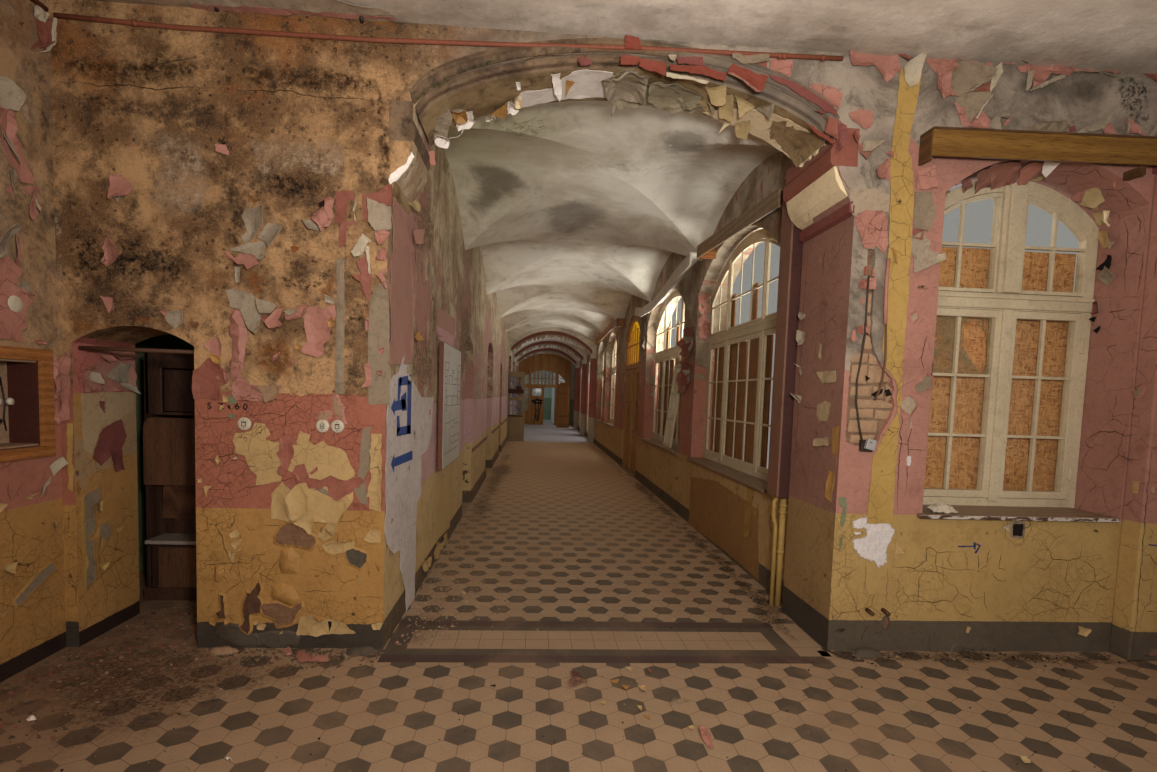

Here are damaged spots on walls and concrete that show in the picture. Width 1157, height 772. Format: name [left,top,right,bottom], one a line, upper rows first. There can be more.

water stain [69,60,198,82]
water stain [244,68,375,91]
water stain [156,136,206,211]
water stain [256,144,343,195]
water stain [75,236,180,277]
peeling [192,205,336,418]
peeling [302,152,443,388]
flaking render [428,35,934,458]
peeling [24,347,141,590]
peeling [215,423,382,580]
peeling [206,579,356,648]
crack [840,547,1005,651]